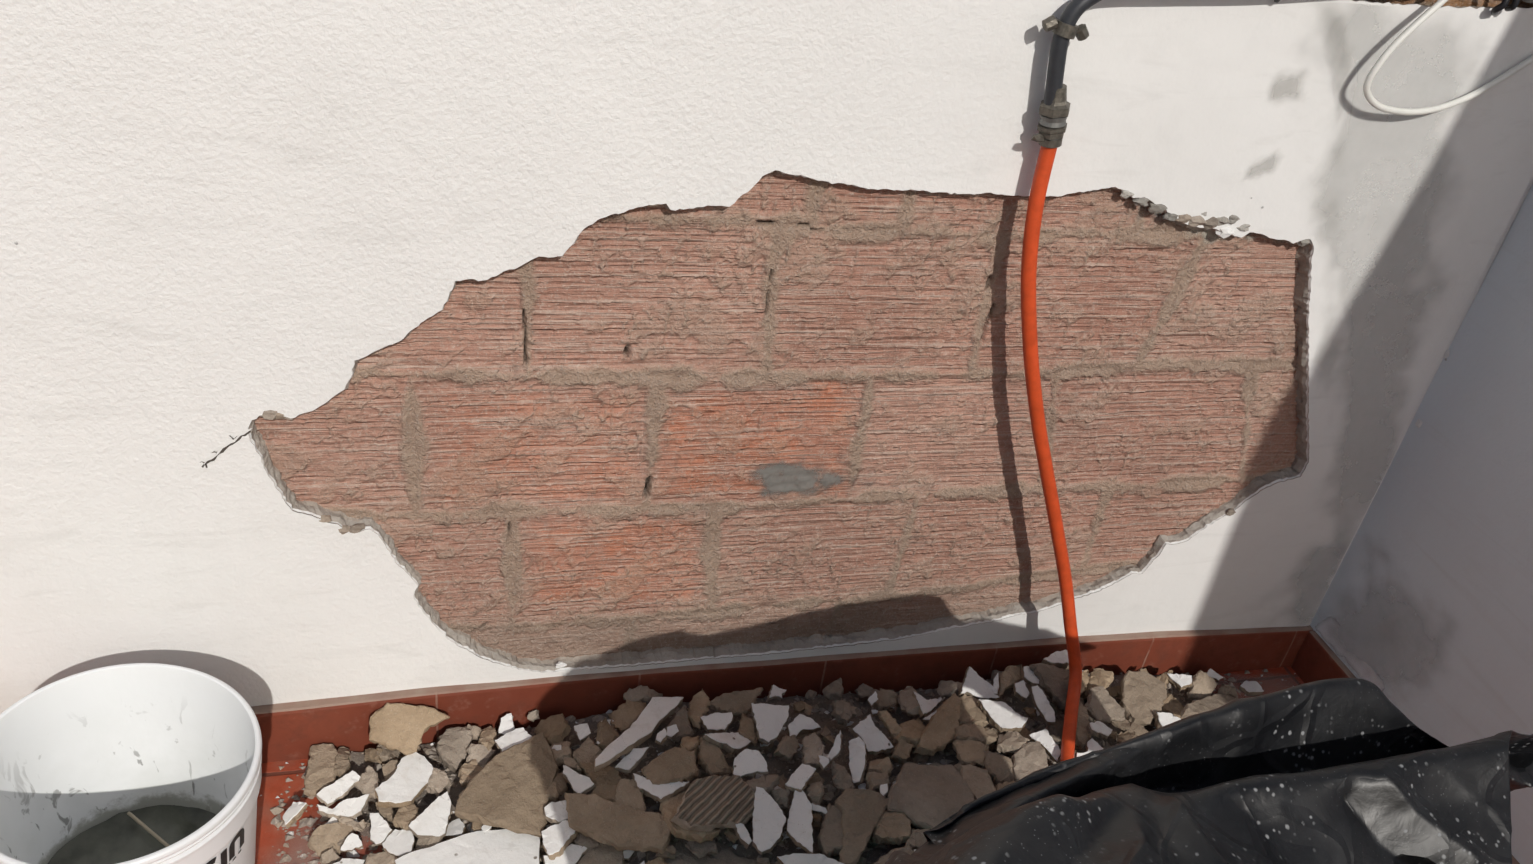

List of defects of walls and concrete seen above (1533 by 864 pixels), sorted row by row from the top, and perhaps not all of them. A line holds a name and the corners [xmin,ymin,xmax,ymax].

spalling [248,170,1314,673]